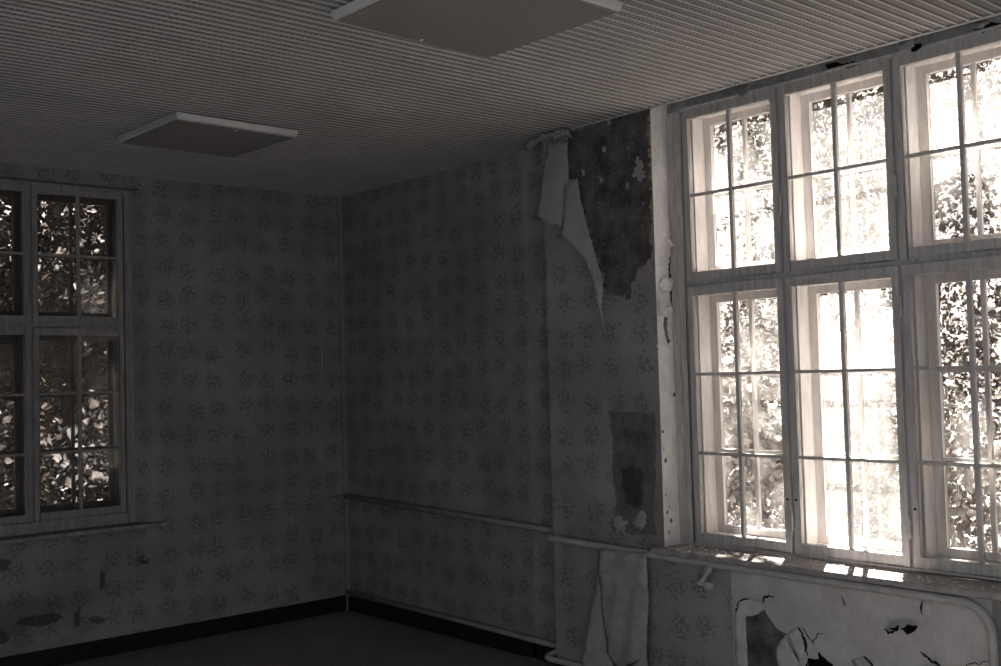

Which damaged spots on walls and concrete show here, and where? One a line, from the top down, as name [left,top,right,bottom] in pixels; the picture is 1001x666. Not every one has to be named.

flaking render [566,109,653,301]
peeling [657,237,674,350]
flaking render [734,595,833,666]
spalling [884,624,918,635]